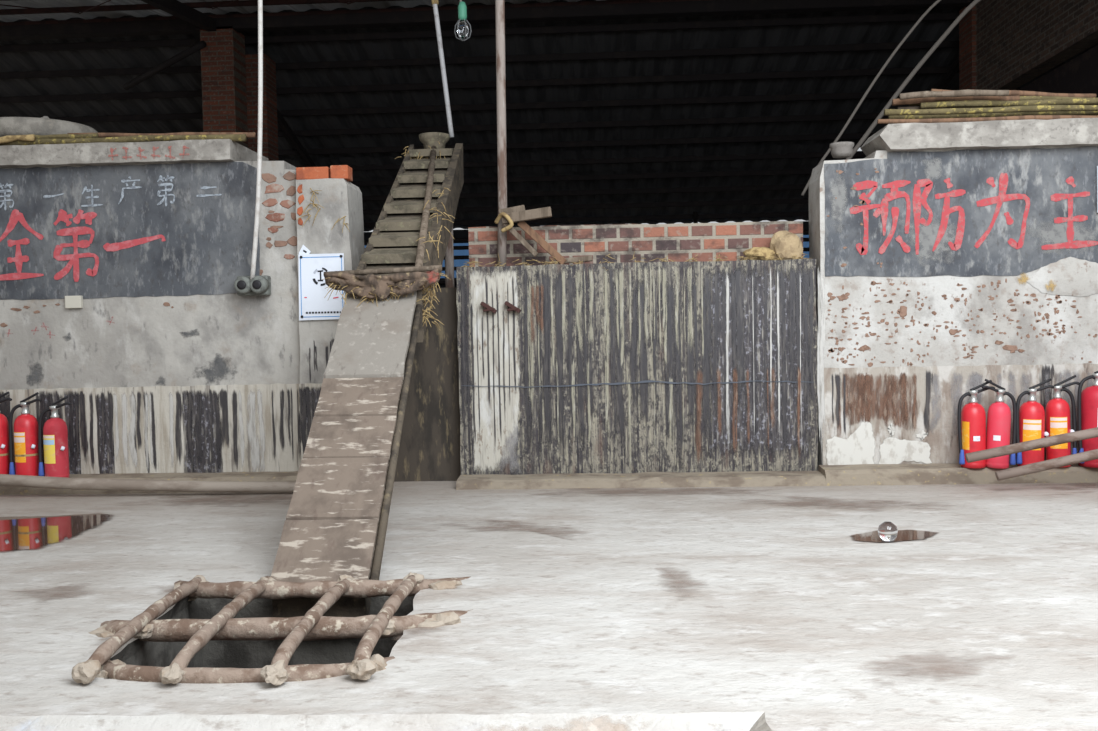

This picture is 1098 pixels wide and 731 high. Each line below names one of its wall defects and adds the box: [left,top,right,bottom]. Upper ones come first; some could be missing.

flaking render [261,171,304,259]
flaking render [827,279,1098,367]
leakage [27,339,334,473]
corrosion [837,374,917,434]